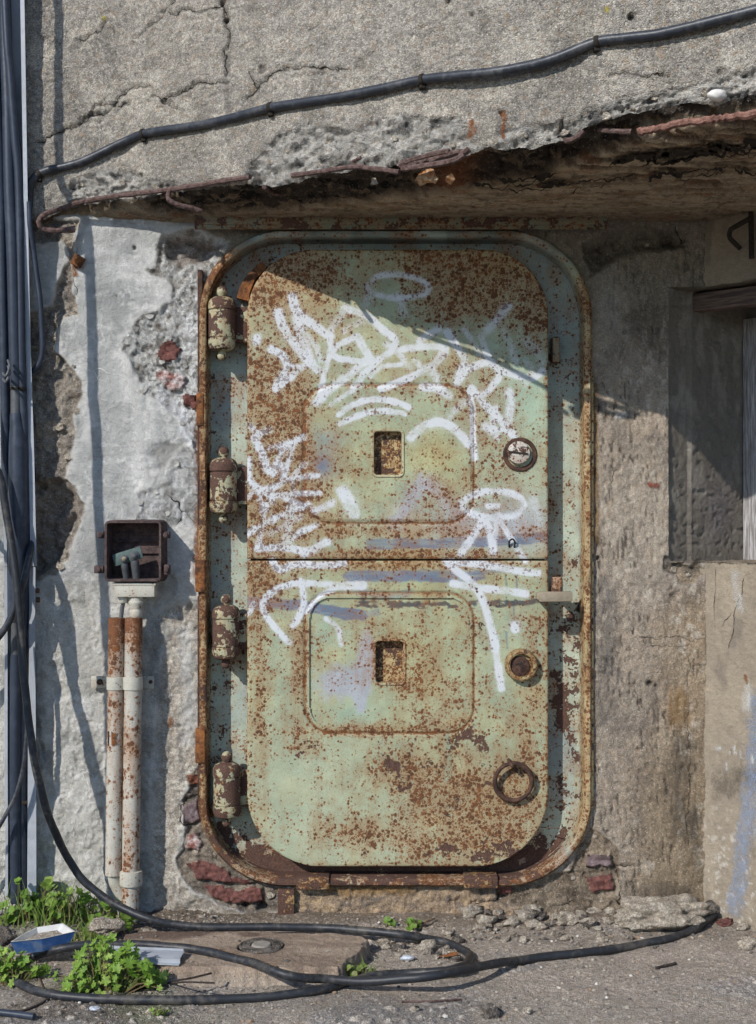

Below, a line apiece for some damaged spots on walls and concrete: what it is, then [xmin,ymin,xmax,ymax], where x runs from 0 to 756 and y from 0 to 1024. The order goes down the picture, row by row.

crack [39,0,347,143]
spalling [30,65,756,586]
flaking render [175,770,287,914]